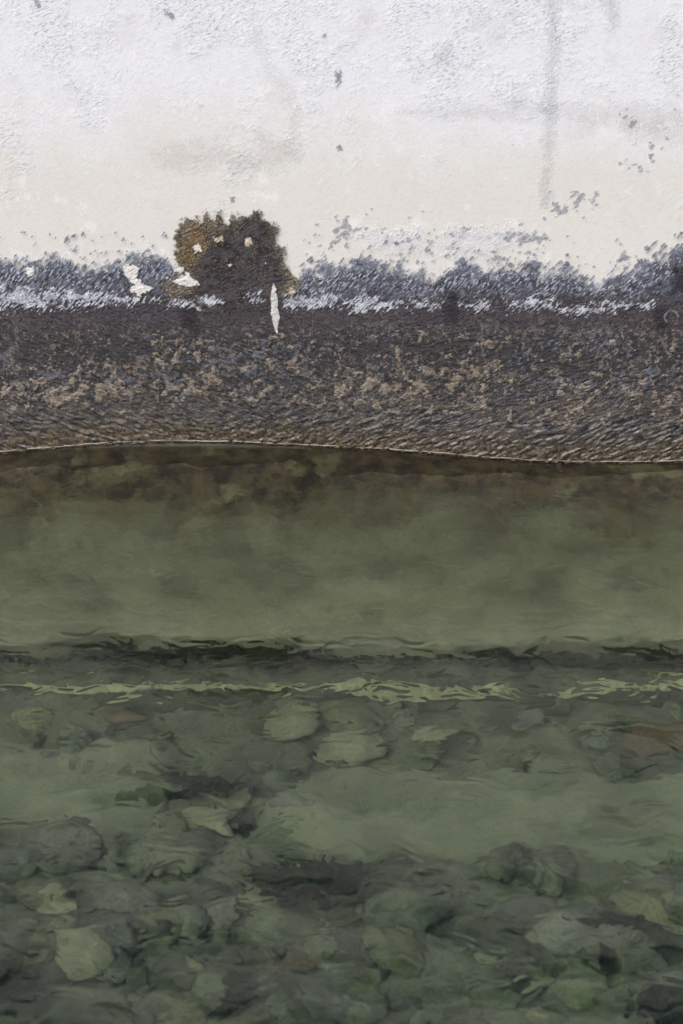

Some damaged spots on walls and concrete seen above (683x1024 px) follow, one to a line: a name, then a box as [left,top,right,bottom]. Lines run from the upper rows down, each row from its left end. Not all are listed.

peeling [123,264,154,297]
peeling [0,284,683,427]